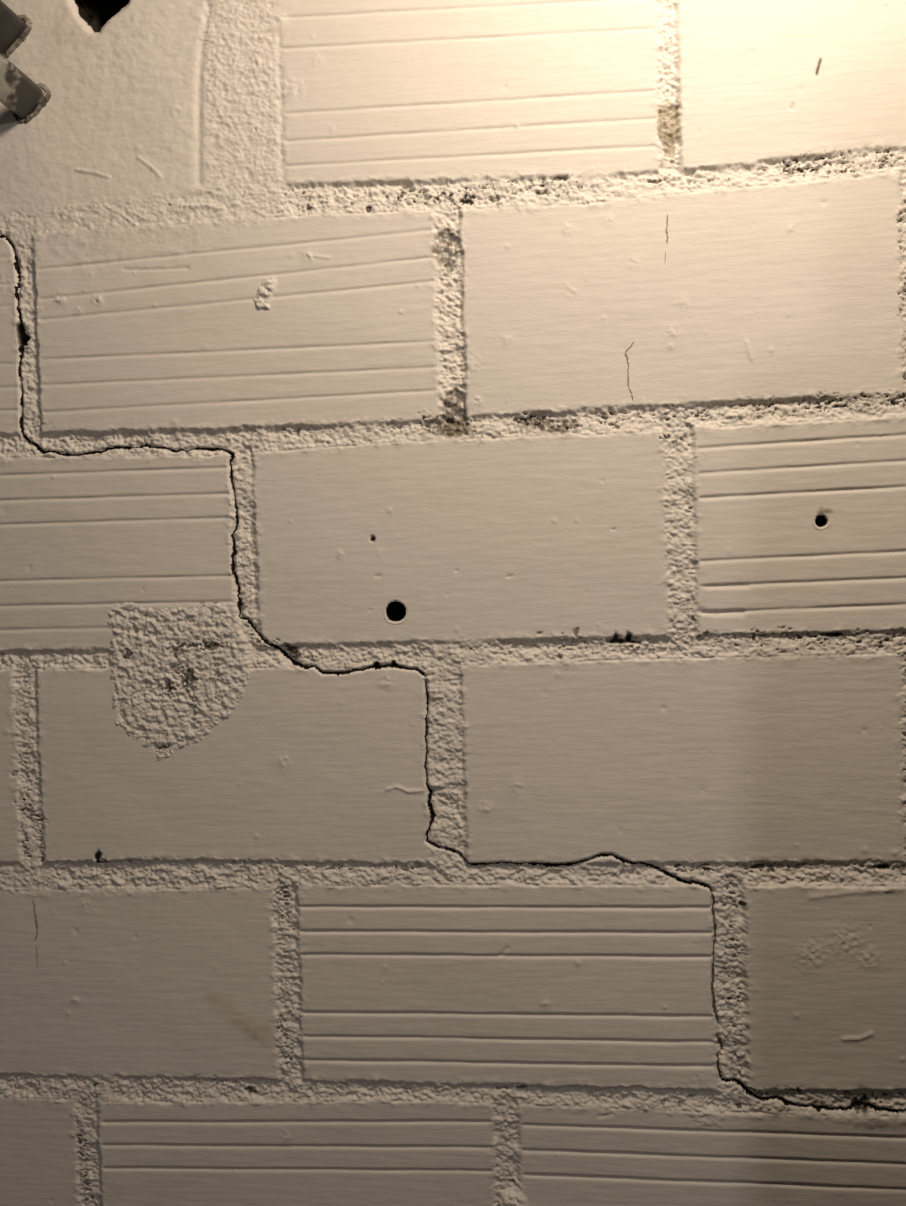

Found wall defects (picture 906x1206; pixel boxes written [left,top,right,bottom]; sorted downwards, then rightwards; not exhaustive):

crack [0,234,906,1113]